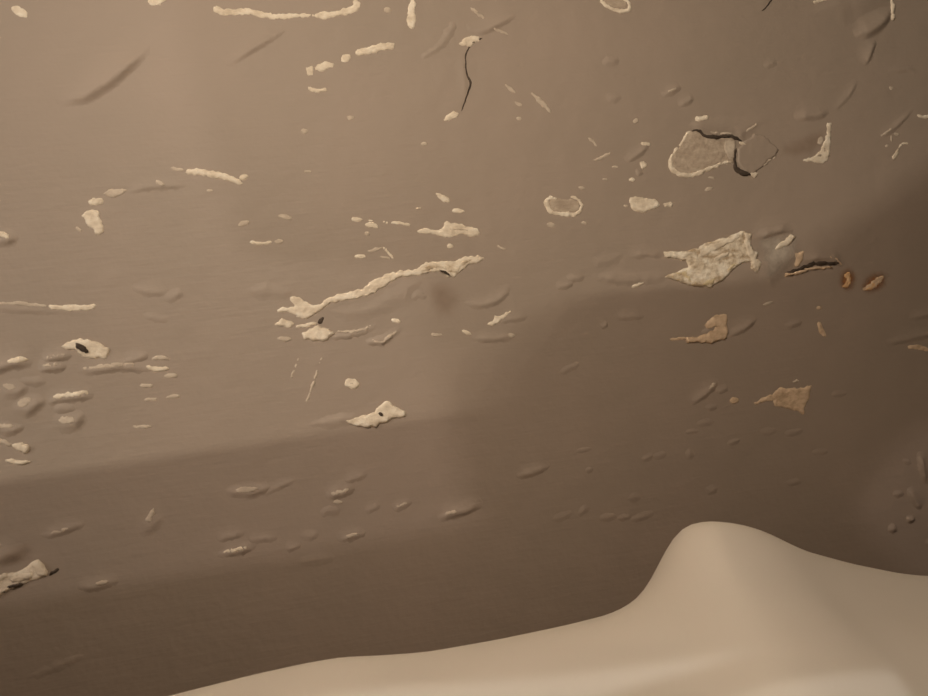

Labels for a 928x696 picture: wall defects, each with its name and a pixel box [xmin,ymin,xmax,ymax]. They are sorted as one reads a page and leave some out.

spalling [600,0,631,14]
crack [444,8,516,121]
peeling [668,114,779,192]
peeling [803,123,832,164]
peeling [352,193,480,249]
spalling [544,186,587,227]
peeling [663,214,845,306]
peeling [246,255,484,342]
peeling [670,313,757,344]
peeling [310,401,406,430]
peeling [754,379,812,415]
peeling [0,535,59,596]